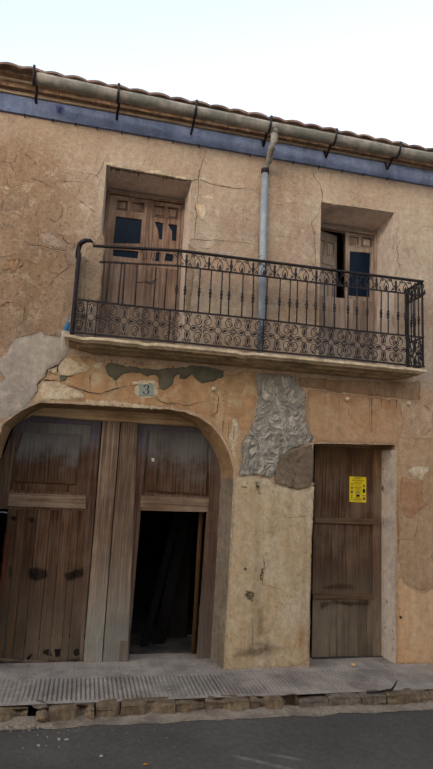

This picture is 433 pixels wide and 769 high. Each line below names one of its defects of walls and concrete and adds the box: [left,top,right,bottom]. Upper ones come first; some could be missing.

crack [1,155,104,214]
crack [190,149,291,249]
crack [0,215,92,337]
peeling [35,357,164,410]
crack [18,356,236,419]
peeling [396,466,429,552]